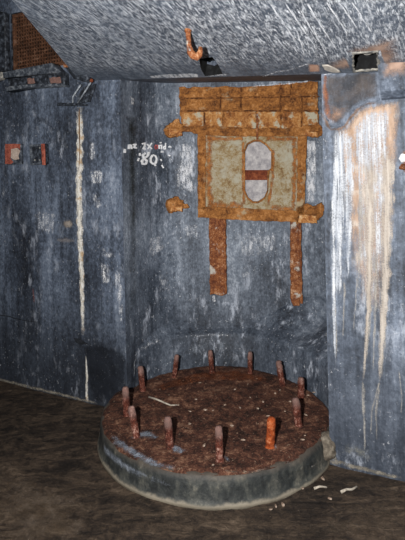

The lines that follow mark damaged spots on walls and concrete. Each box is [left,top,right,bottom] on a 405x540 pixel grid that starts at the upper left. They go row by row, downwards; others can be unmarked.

leakage [75,109,84,325]
leakage [332,112,395,374]
rust [102,366,329,476]
leakage [332,458,396,478]